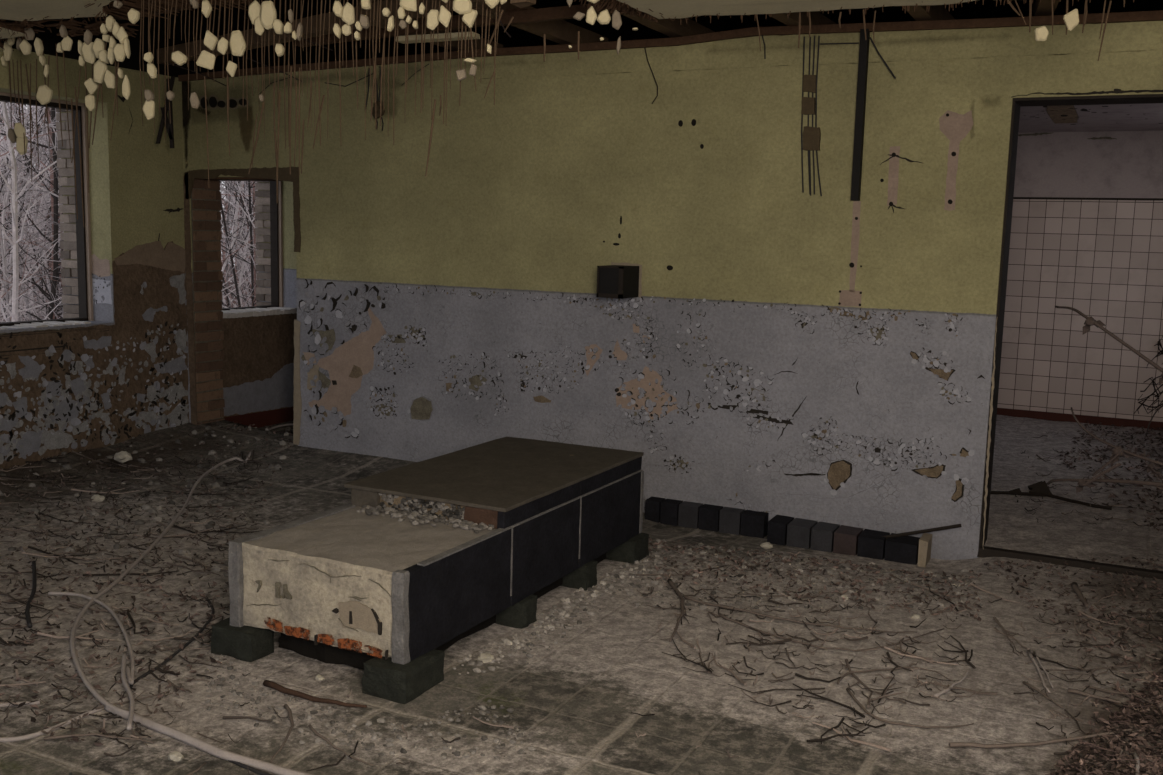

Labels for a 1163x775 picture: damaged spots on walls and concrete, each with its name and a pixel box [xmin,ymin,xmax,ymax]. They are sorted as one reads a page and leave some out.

peeling [0,241,189,469]
peeling [222,201,975,502]